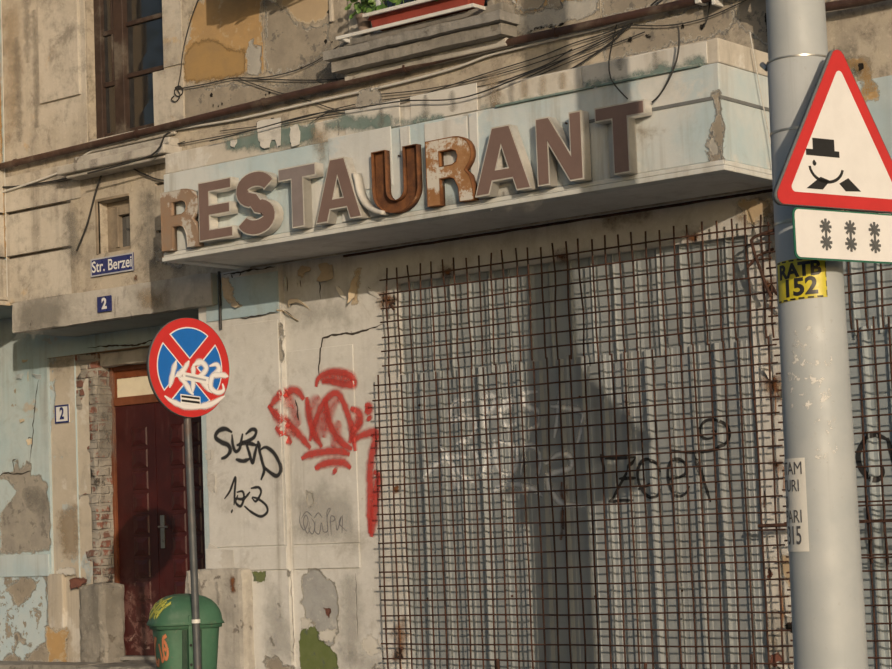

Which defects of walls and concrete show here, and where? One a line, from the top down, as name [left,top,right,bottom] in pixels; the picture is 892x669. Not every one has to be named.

flaking render [184,0,339,122]
flaking render [516,0,768,61]
flaking render [845,55,880,102]
peeling [224,117,315,151]
flaking render [705,89,726,164]
crack [90,340,152,348]
crack [318,324,382,373]
flaking render [0,459,52,555]
peeling [0,567,87,662]
flaking render [263,568,339,669]
flaking render [765,553,794,669]